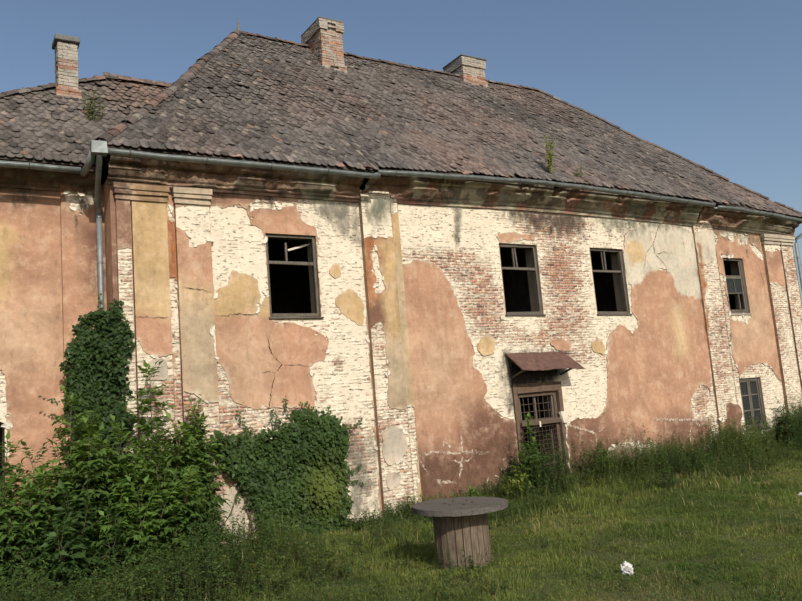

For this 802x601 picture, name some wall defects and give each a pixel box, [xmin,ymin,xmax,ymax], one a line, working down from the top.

spalling [63,191,95,215]
water stain [315,201,359,234]
water stain [366,197,392,220]
water stain [510,210,585,235]
spalling [118,190,658,541]
spalling [669,217,802,452]
spalling [0,370,13,457]
water stain [421,431,519,501]